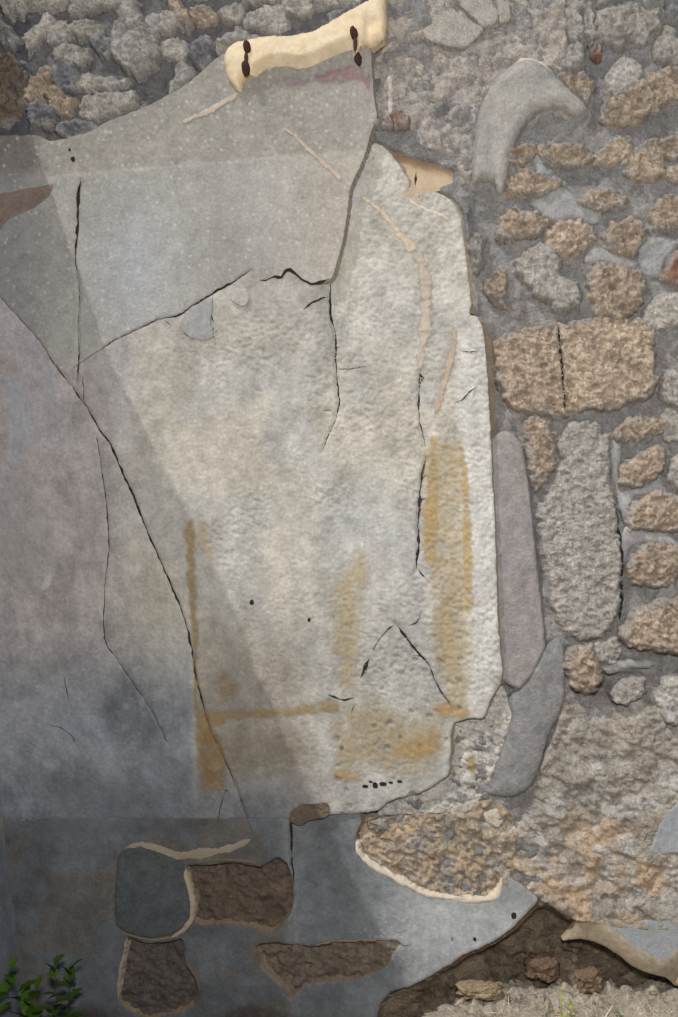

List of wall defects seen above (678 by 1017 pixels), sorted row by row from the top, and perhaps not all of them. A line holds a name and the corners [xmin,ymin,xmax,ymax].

crack [284,127,342,179]
spalling [387,147,454,202]
crack [361,196,477,580]
crack [1,181,364,834]
damp [460,447,472,610]
crack [329,613,454,714]
spalling [190,858,294,927]
spalling [355,799,517,903]
spalling [117,938,200,1016]
spalling [257,939,399,994]